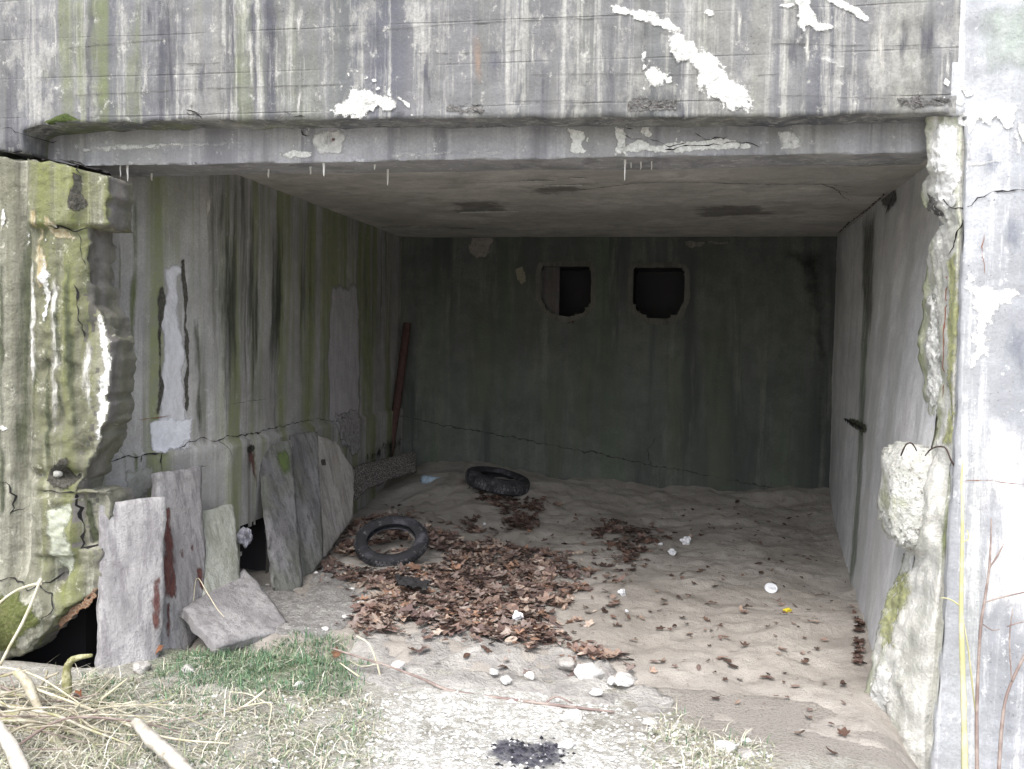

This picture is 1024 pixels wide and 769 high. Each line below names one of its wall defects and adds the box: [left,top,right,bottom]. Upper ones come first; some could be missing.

peeling [330,70,413,120]
peeling [611,5,753,113]
crack [0,127,116,176]
damp [29,211,91,456]
peeling [96,314,113,440]
peeling [150,259,192,453]
damp [226,241,236,360]
damp [271,246,280,341]
crack [942,189,1022,398]
crack [111,417,346,466]
crack [406,416,775,488]
damp [46,504,75,575]